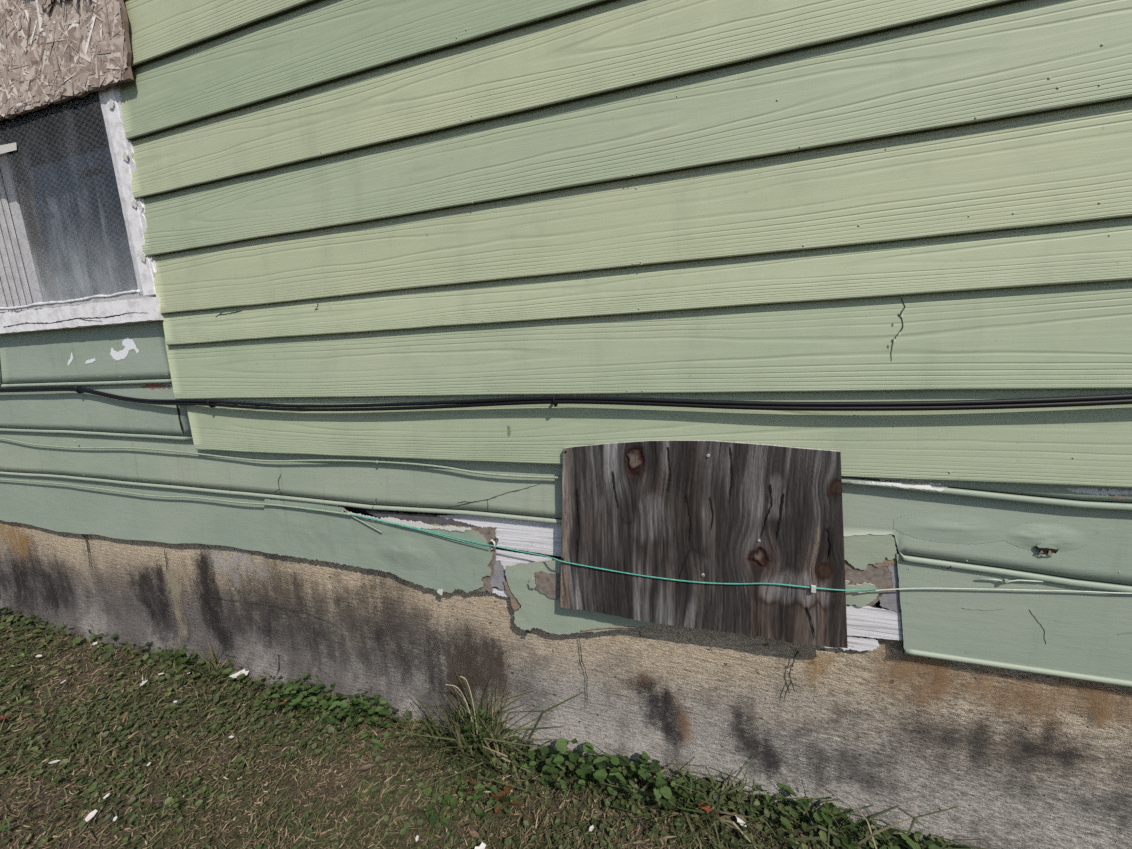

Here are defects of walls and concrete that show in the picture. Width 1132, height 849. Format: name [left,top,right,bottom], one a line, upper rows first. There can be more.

crack [891,298,906,361]
damp [0,553,72,609]
damp [130,551,256,651]
peeling [844,534,901,613]
damp [637,676,686,749]
damp [738,714,782,778]